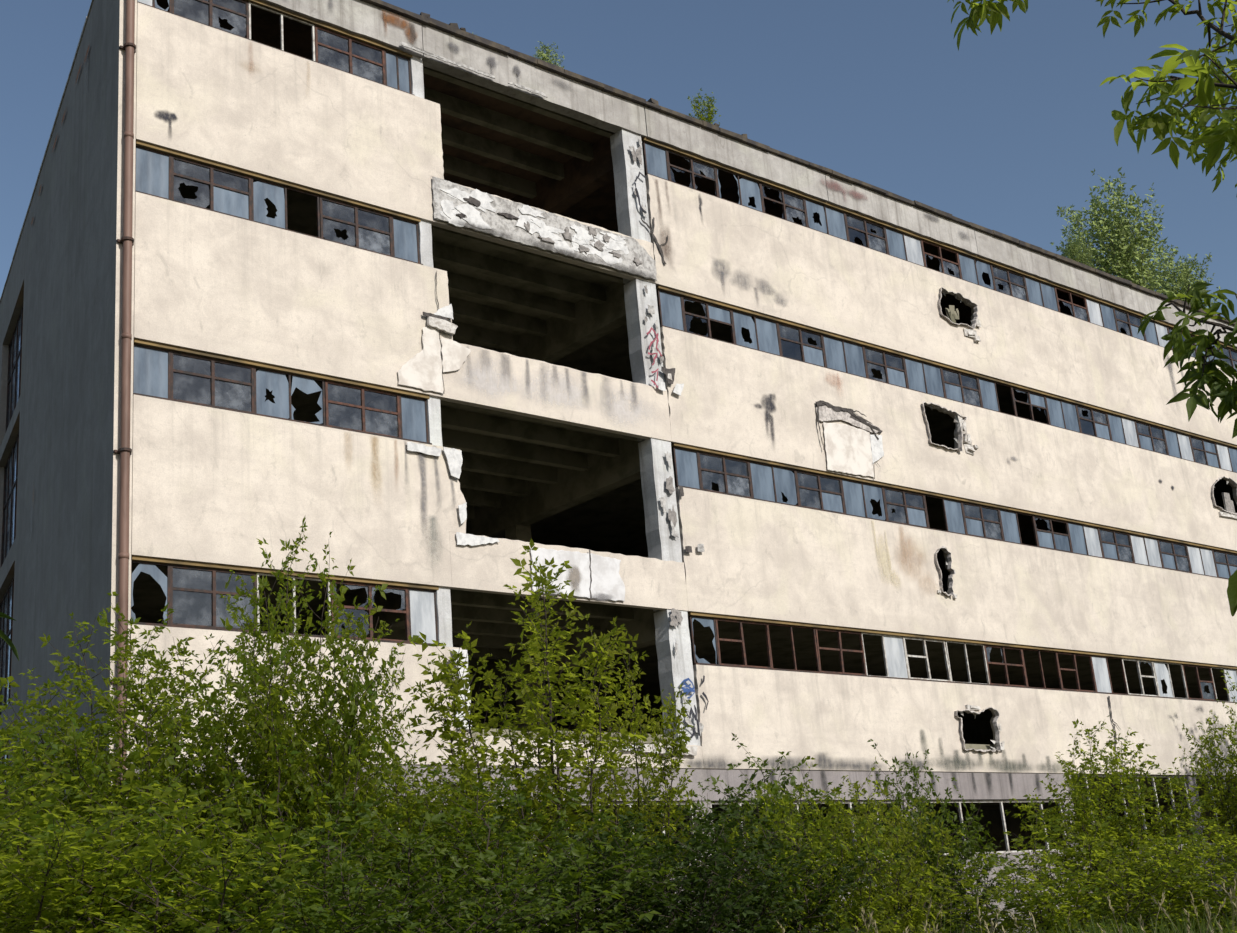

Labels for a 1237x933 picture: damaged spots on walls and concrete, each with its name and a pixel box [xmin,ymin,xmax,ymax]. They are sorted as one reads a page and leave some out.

peeling [629,136,642,165]
peeling [432,176,684,396]
peeling [423,304,471,372]
spalling [938,287,981,343]
spalling [816,400,884,464]
spalling [921,401,979,455]
spalling [407,442,463,479]
peeling [456,502,499,546]
spalling [1211,476,1237,520]
spalling [934,546,957,599]
spalling [954,705,1004,752]